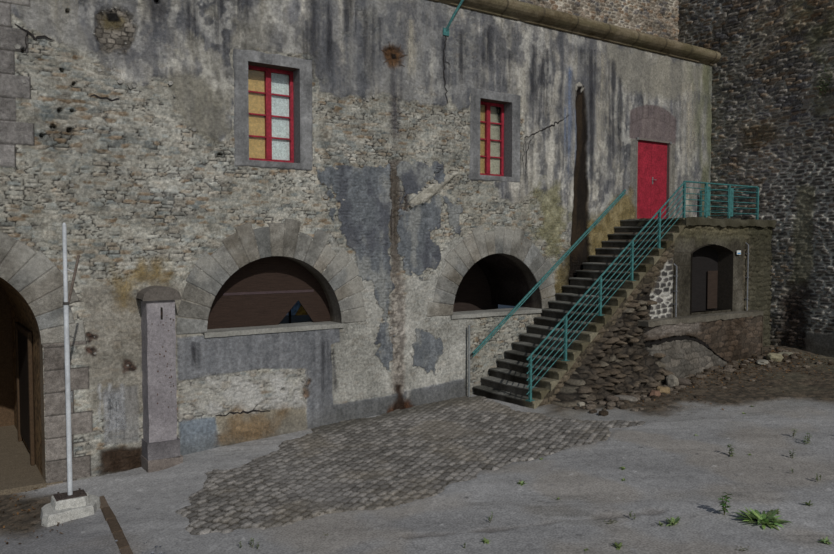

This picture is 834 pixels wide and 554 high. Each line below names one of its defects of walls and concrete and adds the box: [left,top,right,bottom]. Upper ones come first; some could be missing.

crack [15,24,54,51]
spalling [93,6,136,53]
rust [382,43,405,70]
peeling [14,20,233,231]
crack [523,115,569,175]
water stain [566,50,593,285]
crack [215,404,270,416]
rust [387,384,412,413]